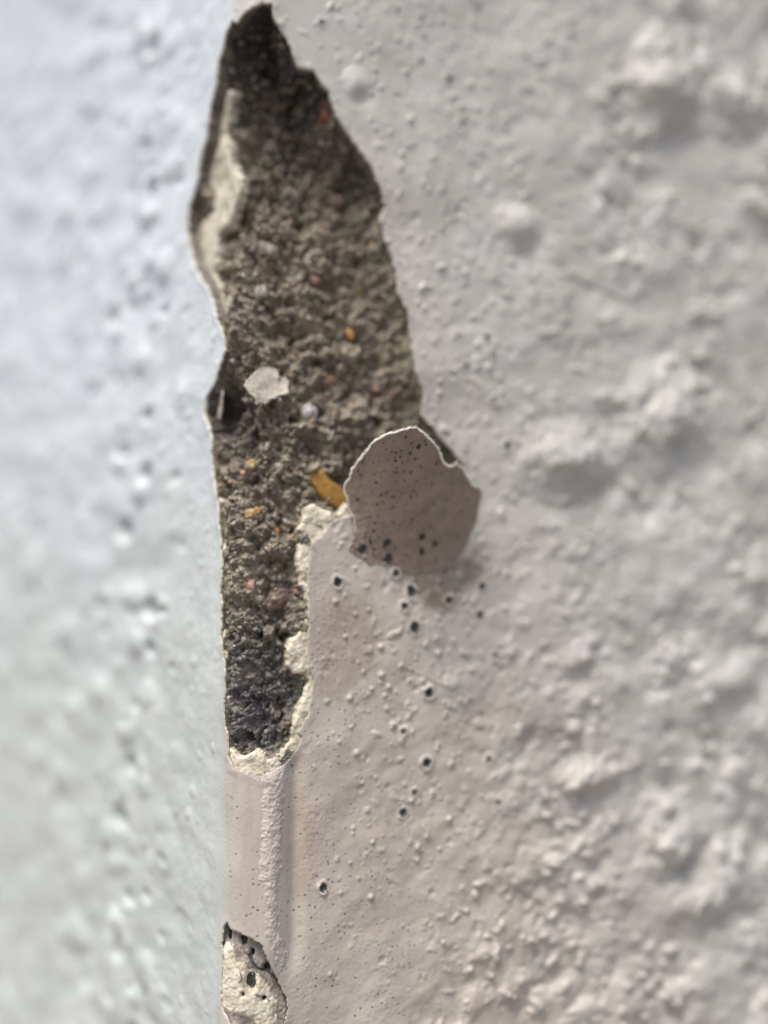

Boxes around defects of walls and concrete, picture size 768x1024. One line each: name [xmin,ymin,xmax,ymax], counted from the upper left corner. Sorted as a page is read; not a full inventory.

spalling [198,5,483,778]
spalling [222,925,288,1024]